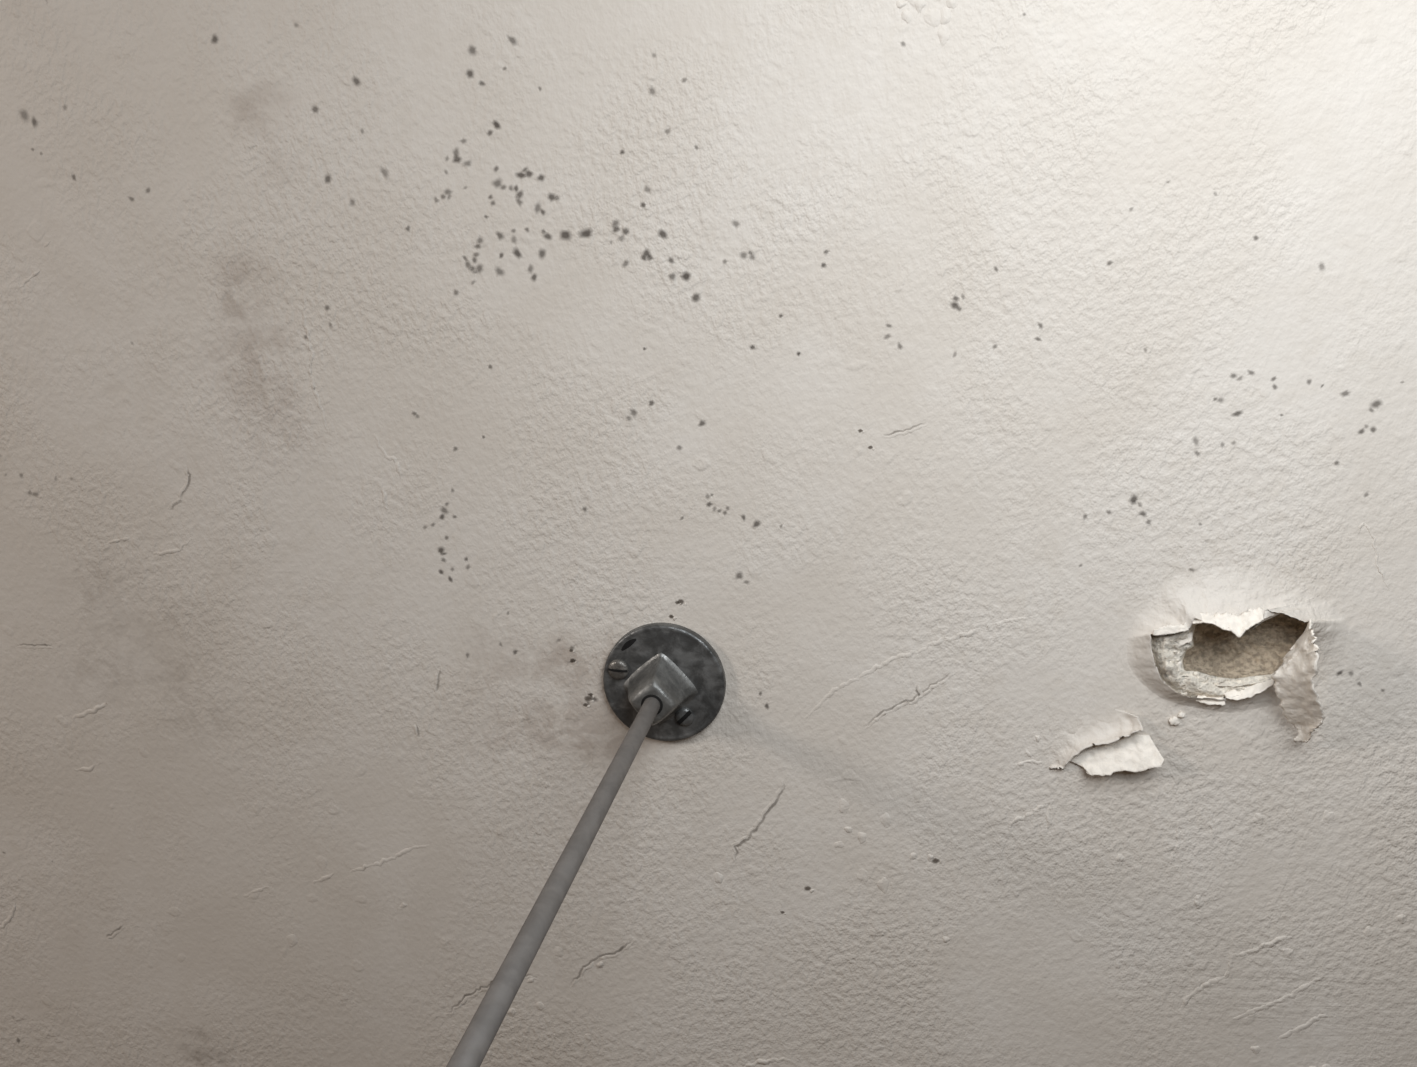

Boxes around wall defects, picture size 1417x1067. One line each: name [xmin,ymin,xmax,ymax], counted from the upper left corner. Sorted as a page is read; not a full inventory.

peeling [1043,709,1164,776]
spalling [1127,565,1348,743]